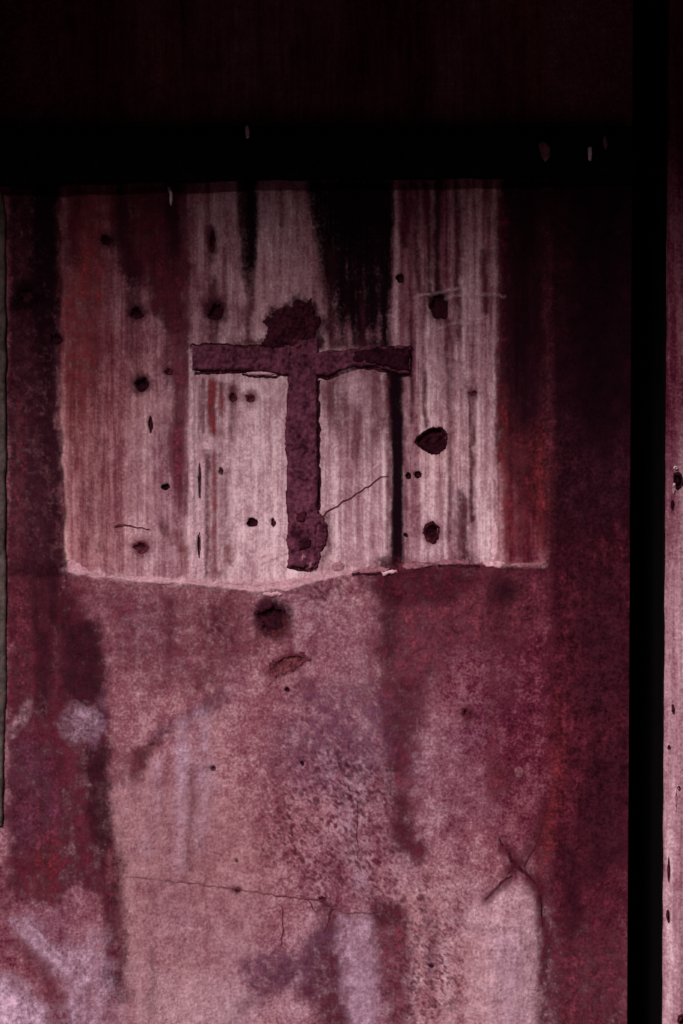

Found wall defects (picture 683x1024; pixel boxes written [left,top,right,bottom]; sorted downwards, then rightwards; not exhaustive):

water stain [237,181,262,346]
water stain [265,179,441,348]
rust [199,379,233,436]
rust [205,453,227,579]
crack [322,476,388,517]
water stain [4,187,131,1002]
crack [124,876,398,943]
crack [485,812,545,940]